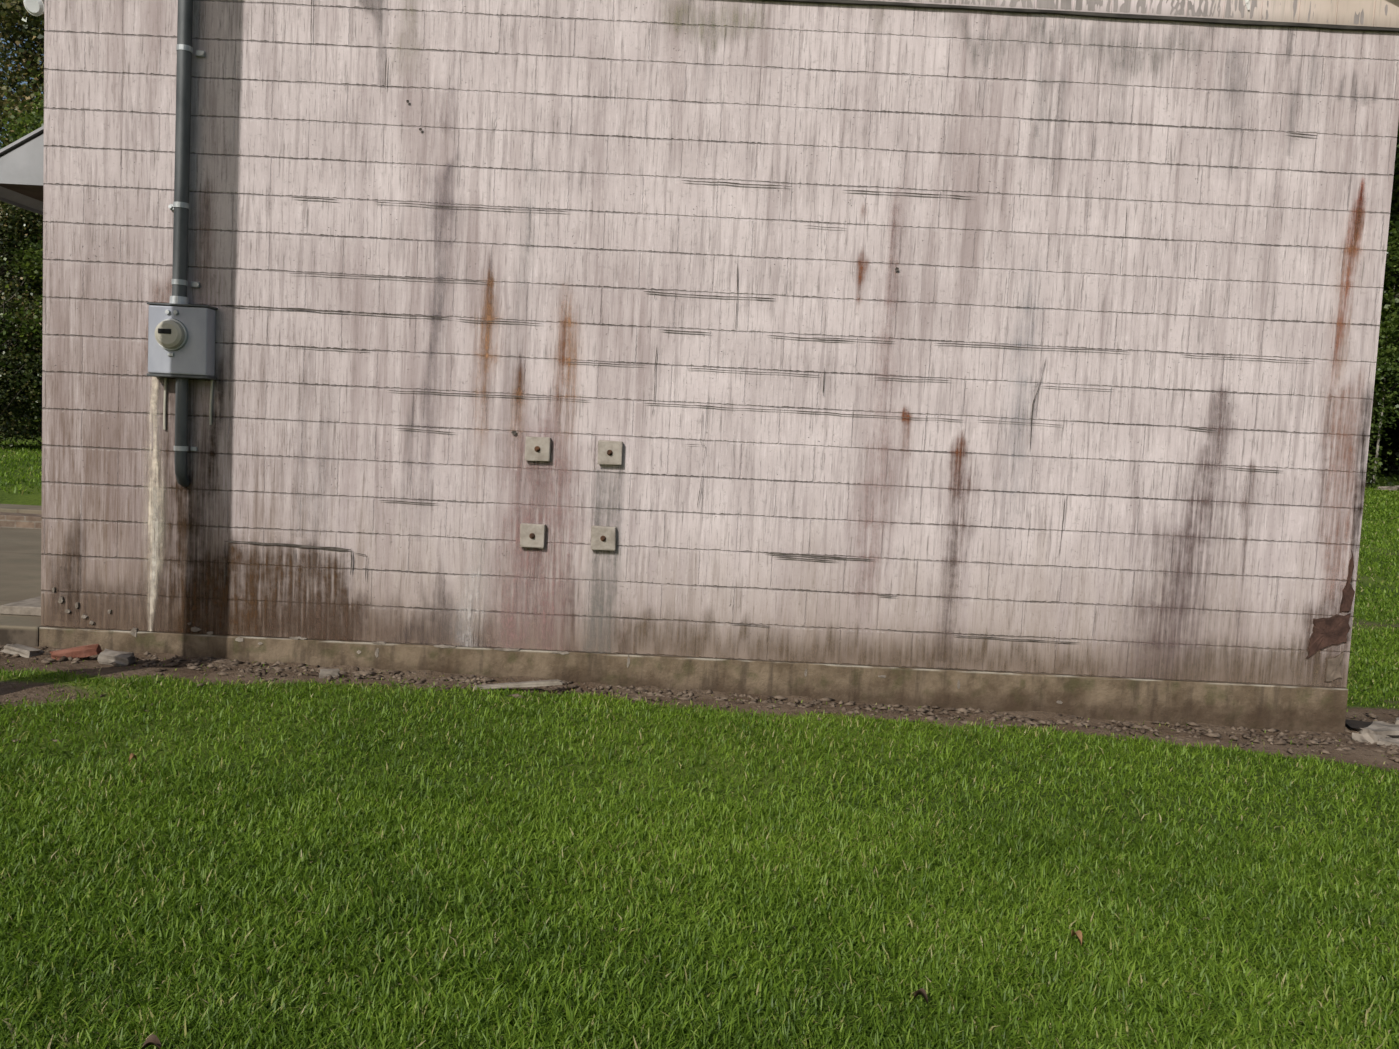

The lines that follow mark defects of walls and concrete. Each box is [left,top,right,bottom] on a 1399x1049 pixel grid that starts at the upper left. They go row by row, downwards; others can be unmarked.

rust [1345,183,1363,295]
rust [481,271,494,360]
rust [558,316,576,398]
damp [51,370,377,641]
rust [956,442,970,495]
damp [1139,390,1327,685]
spalling [1306,549,1355,682]